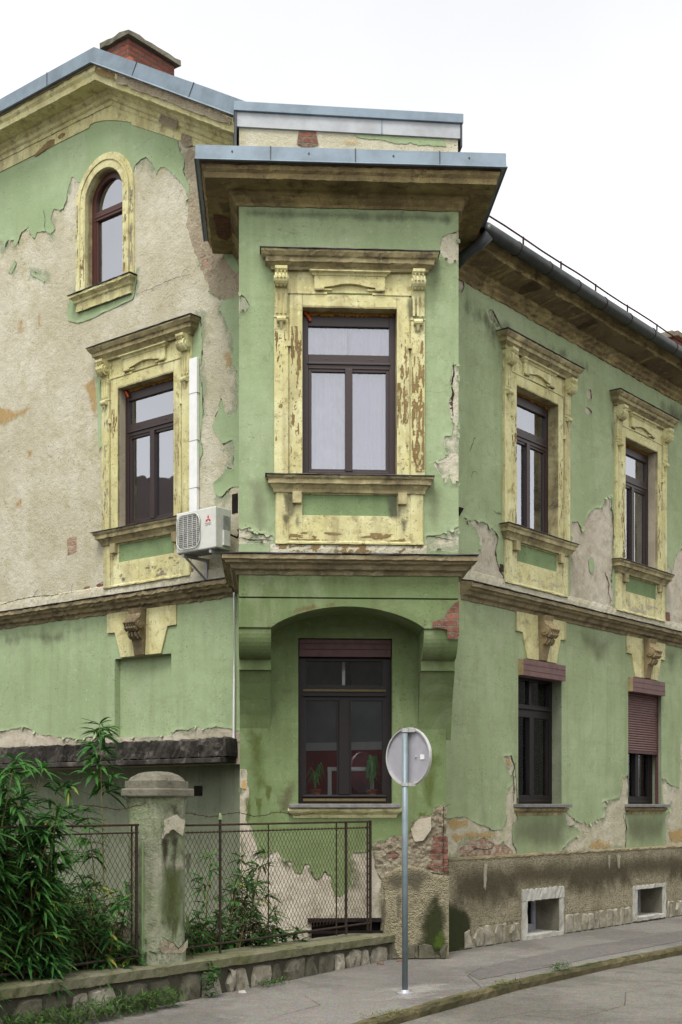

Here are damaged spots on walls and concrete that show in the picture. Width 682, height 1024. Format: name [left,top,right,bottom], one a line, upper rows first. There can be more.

flaking render [0,114,626,612]